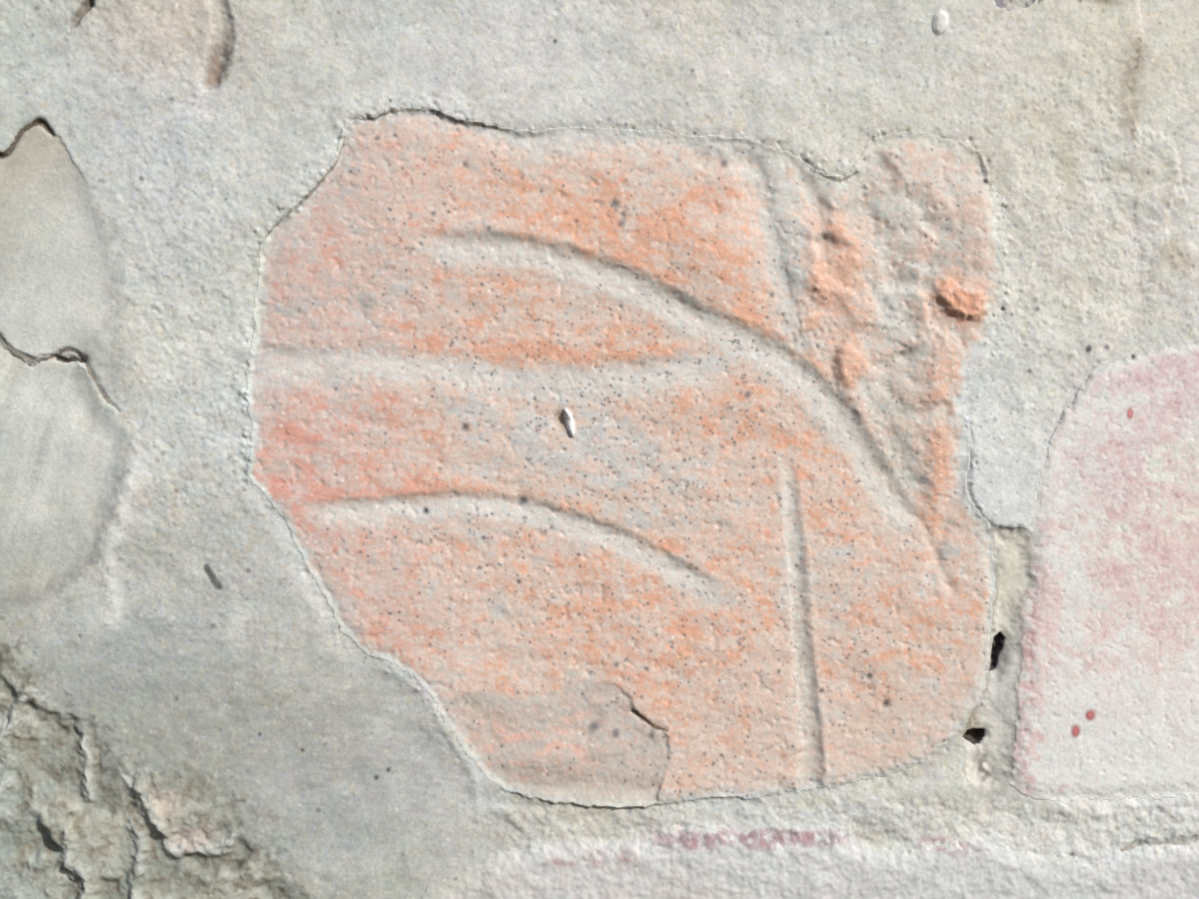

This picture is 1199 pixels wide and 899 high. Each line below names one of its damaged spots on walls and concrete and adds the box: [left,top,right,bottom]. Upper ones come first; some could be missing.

peeling [0,125,121,384]
spalling [0,645,308,899]